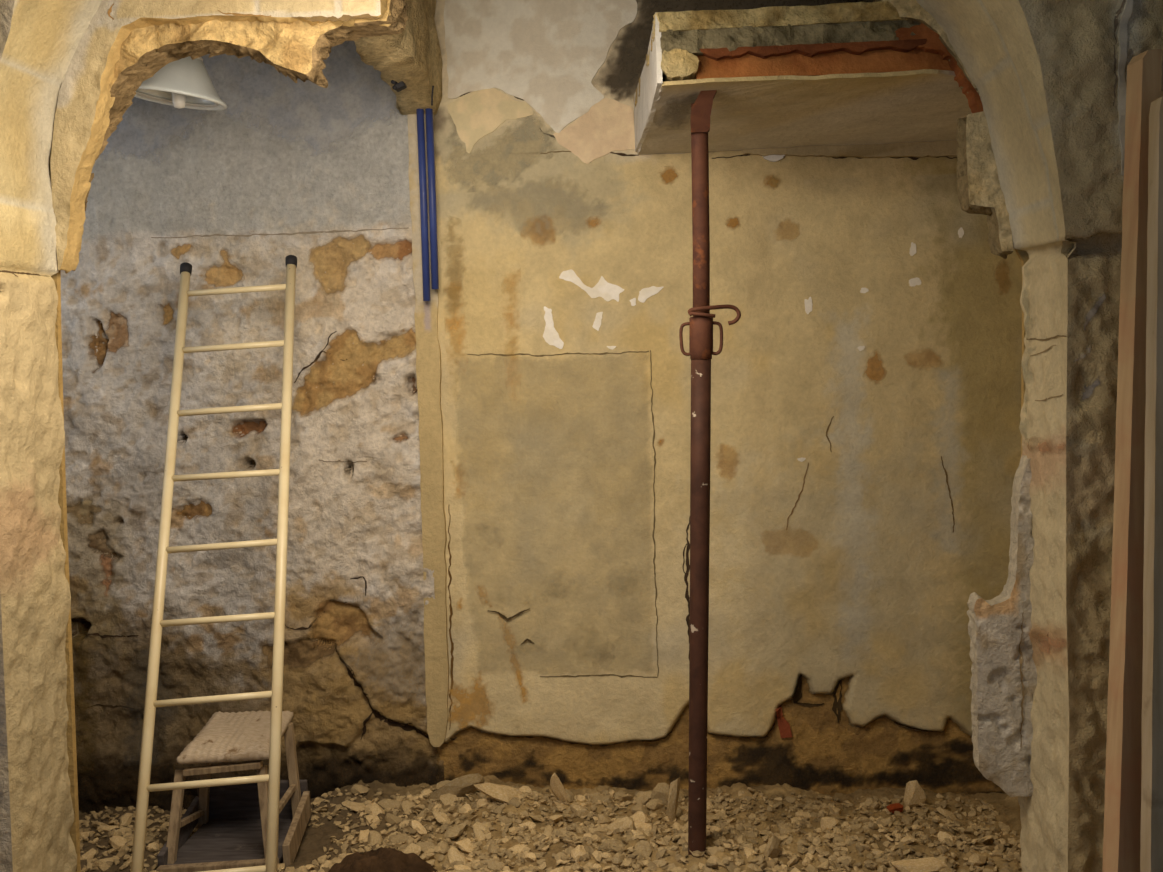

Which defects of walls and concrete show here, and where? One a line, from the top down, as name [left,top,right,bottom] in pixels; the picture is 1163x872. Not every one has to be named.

peeling [444,0,638,164]
spalling [205,250,243,287]
spalling [310,235,412,294]
peeling [543,306,564,349]
peeling [559,269,663,331]
spalling [292,328,416,415]
crack [786,416,834,530]
crack [285,506,457,741]
spalling [436,705,689,791]
leakage [600,768,689,790]
spalling [707,674,1005,796]
leakage [719,740,1004,794]